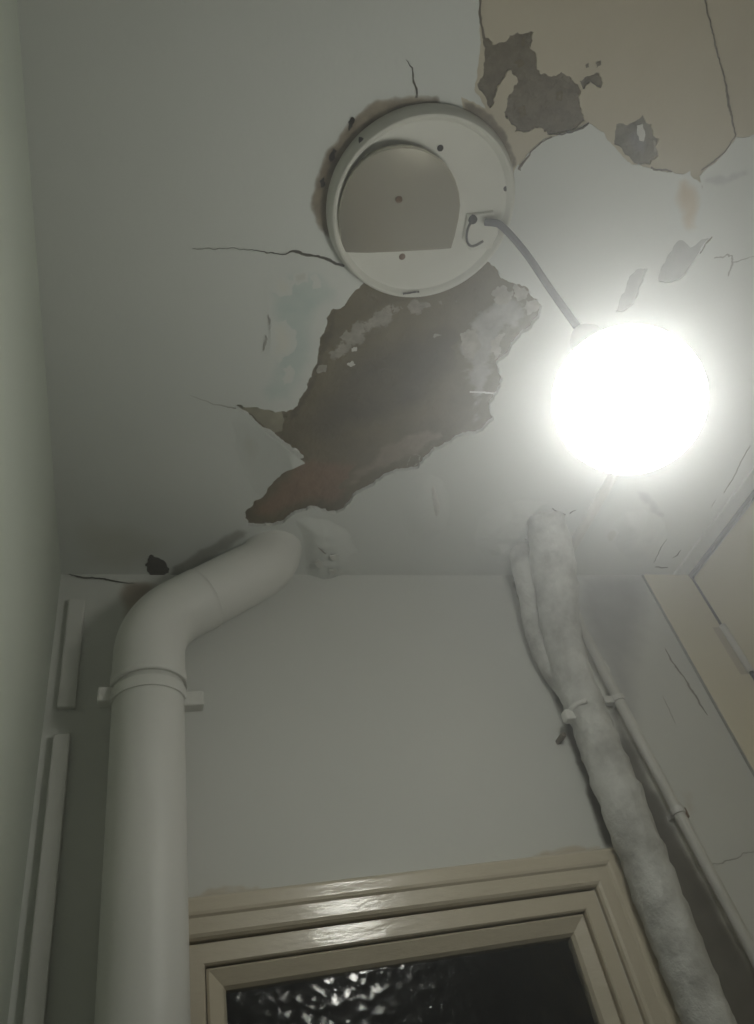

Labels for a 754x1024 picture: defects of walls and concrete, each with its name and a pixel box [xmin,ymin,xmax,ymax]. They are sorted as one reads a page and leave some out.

crack [406,60,418,98]
peeling [461,0,754,182]
crack [193,247,345,267]
flaking render [658,238,709,282]
flaking render [616,268,646,311]
flaking render [237,262,540,524]
crack [665,649,707,714]